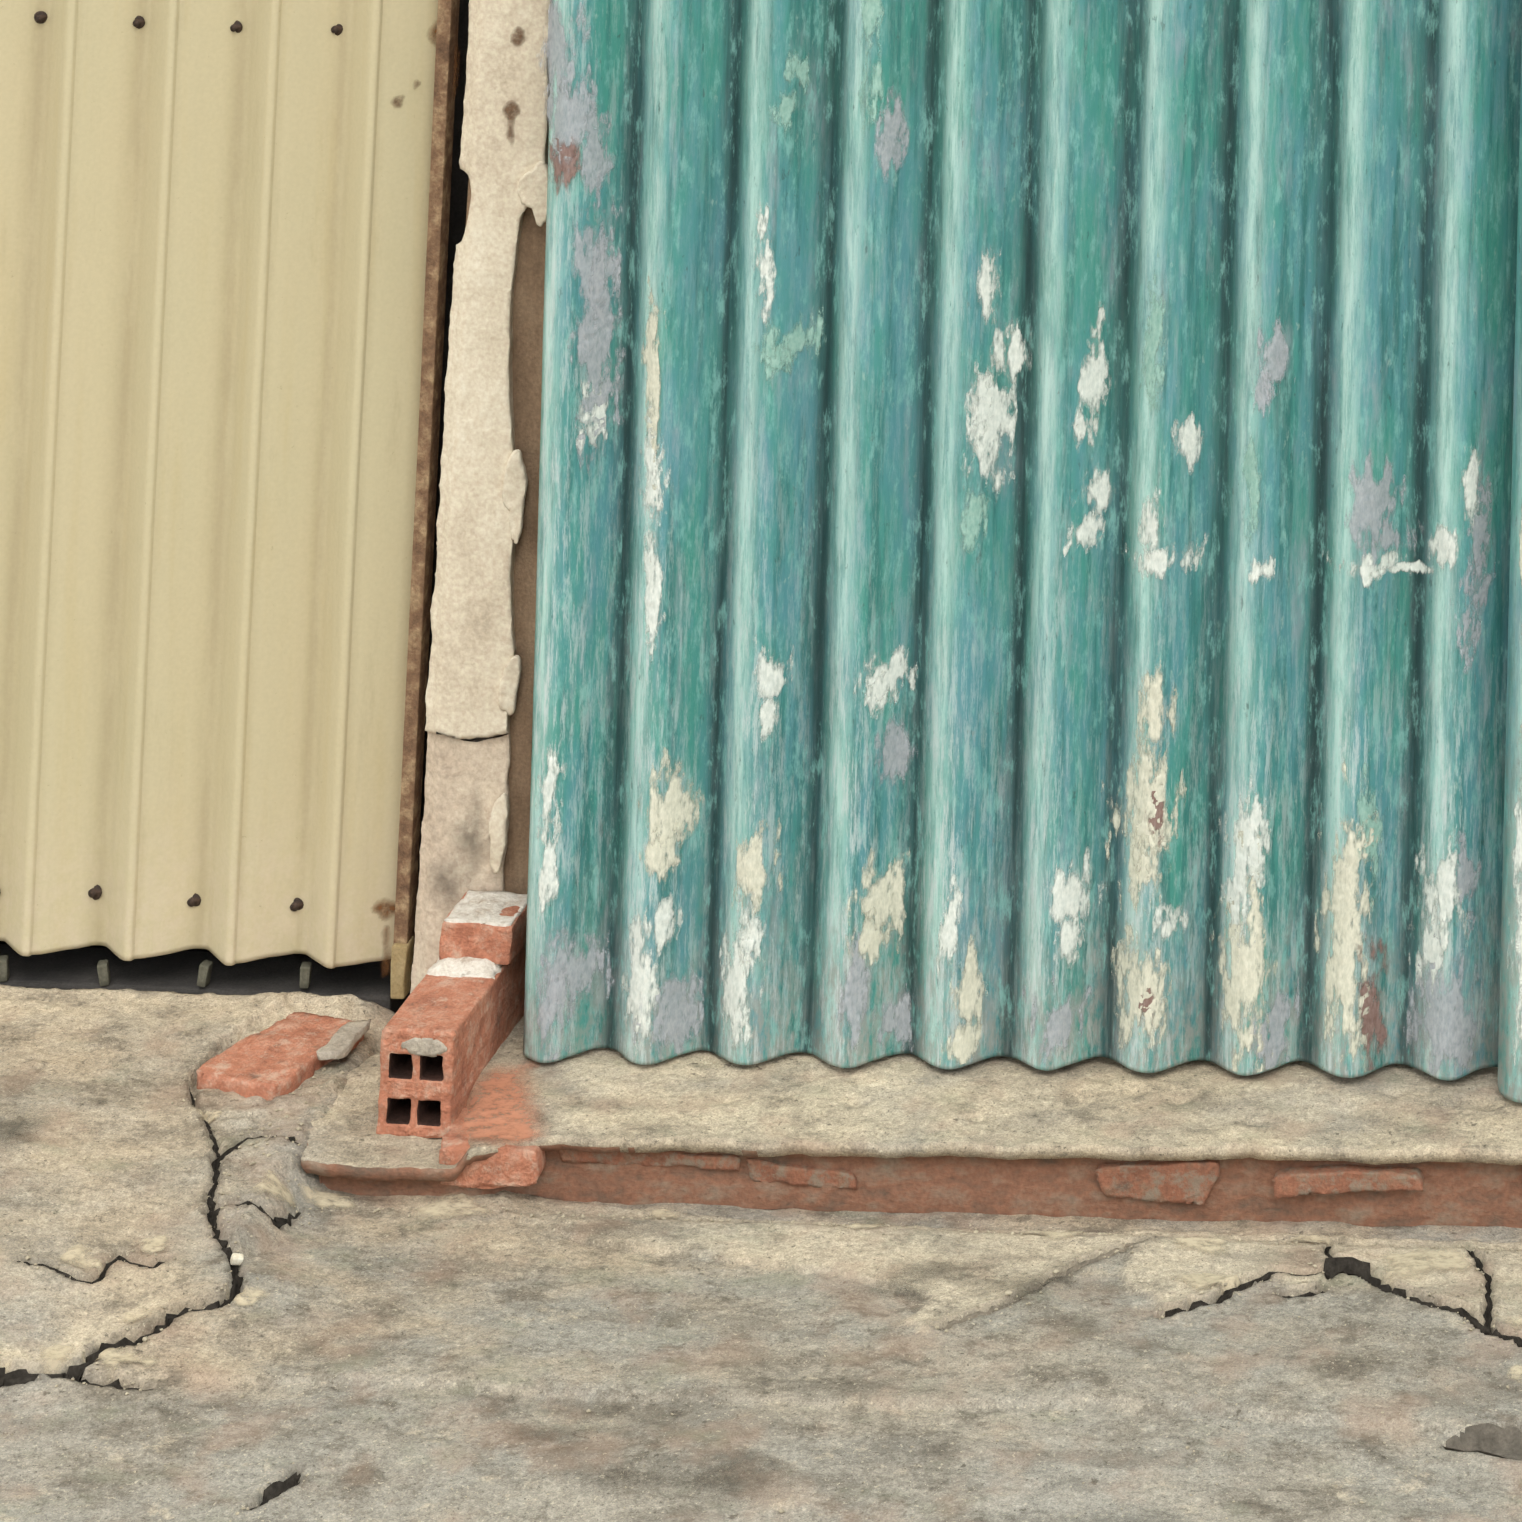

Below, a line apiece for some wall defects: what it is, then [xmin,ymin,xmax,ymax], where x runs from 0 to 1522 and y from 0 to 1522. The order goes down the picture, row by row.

spalling [489,0,613,920]
peeling [640,278,670,656]
peeling [961,253,1027,551]
peeling [1073,307,1110,445]
corrosion [374,903,395,935]
peeling [537,749,704,1060]
peeling [1050,670,1188,1048]
peeling [1219,780,1299,1073]
peeling [1314,762,1387,1071]
crack [10,1250,177,1284]
crack [55,1086,312,1395]
crack [1145,1236,1522,1347]